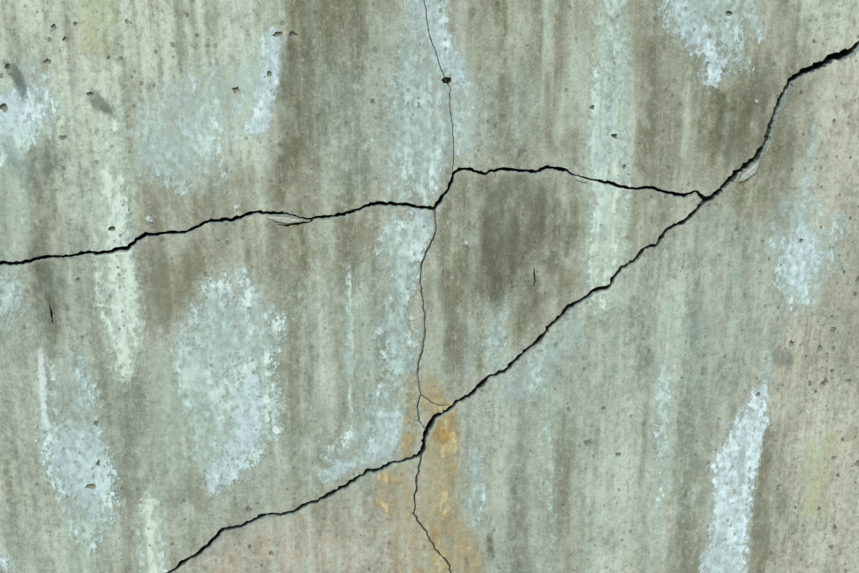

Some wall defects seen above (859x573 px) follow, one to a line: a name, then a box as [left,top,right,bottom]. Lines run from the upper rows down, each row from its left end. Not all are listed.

crack [424,1,451,105]
damp [652,0,764,104]
efflorescence [35,351,121,573]
efflorescence [136,491,169,573]
damp [157,267,287,494]
crack [0,165,707,266]
crack [166,41,859,573]
damp [699,380,771,573]